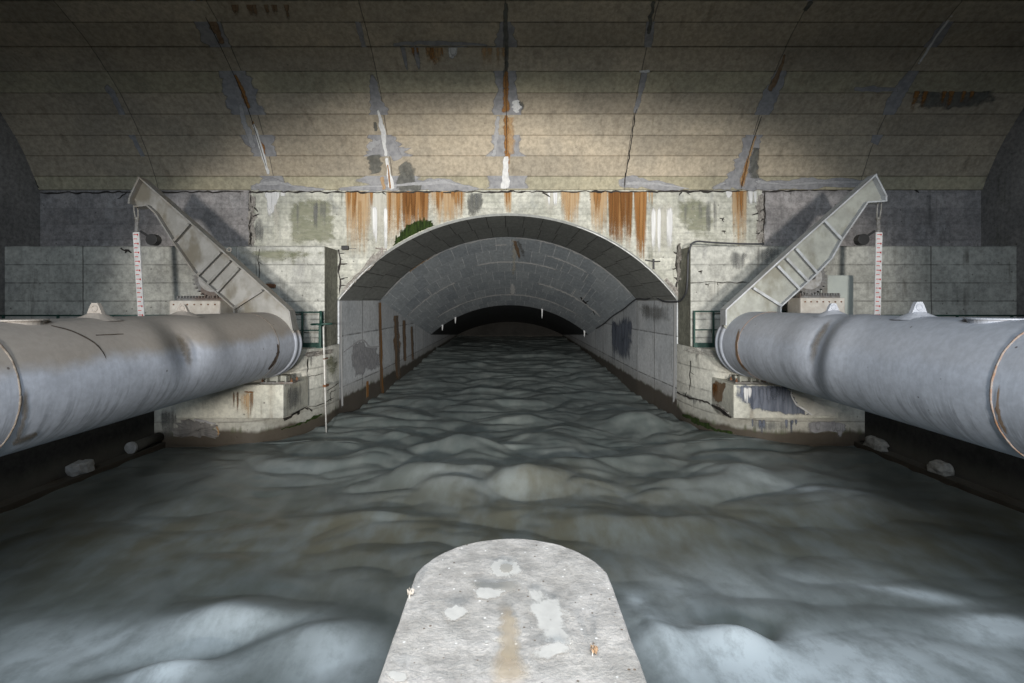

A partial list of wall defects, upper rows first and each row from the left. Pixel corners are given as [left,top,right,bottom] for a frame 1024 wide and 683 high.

crack [162,109,851,197]
crack [34,178,131,199]
corrosion [346,191,373,234]
corrosion [387,191,463,228]
corrosion [562,191,653,252]
leakage [327,265,379,406]
corrosion [366,303,414,399]
leakage [578,227,697,404]
corrosion [233,391,253,410]
crack [677,361,710,405]